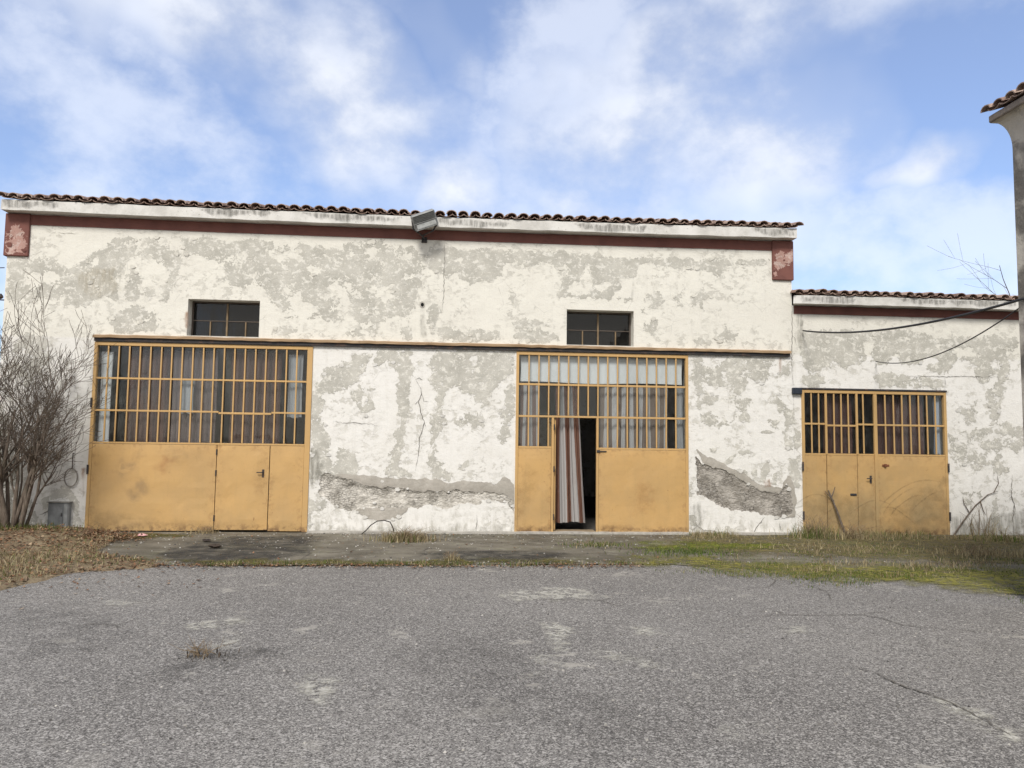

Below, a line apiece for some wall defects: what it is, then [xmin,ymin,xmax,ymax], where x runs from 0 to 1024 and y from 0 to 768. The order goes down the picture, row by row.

crack [326,378,428,493]
peeling [0,225,801,531]
peeling [690,325,1024,475]
peeling [961,486,1001,533]